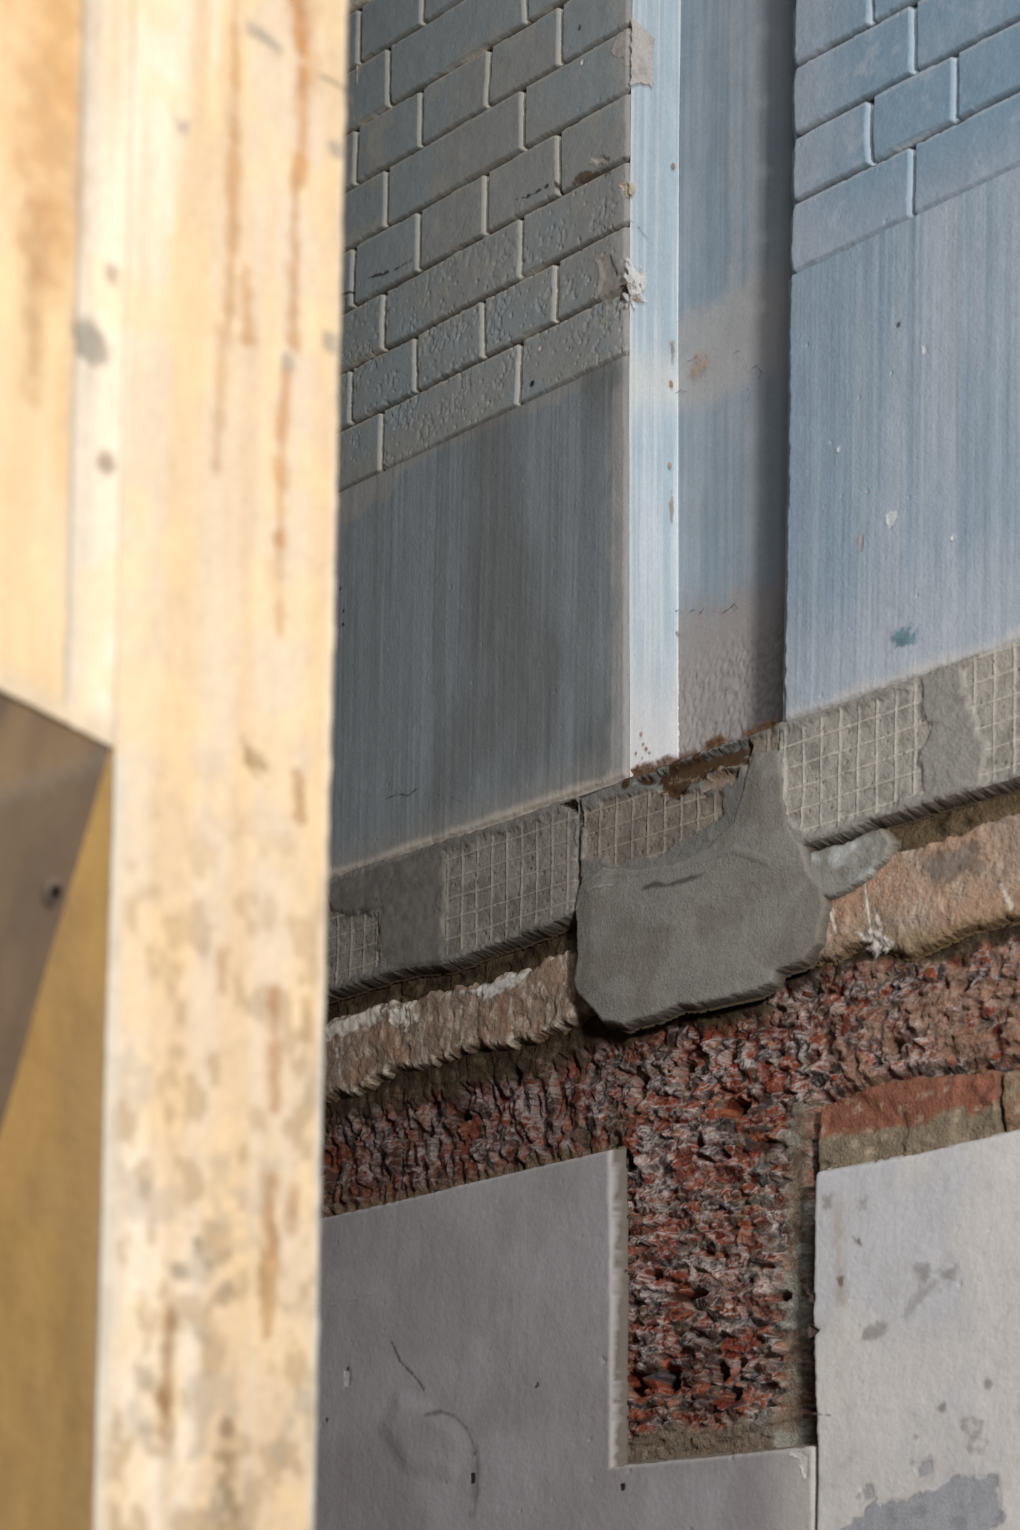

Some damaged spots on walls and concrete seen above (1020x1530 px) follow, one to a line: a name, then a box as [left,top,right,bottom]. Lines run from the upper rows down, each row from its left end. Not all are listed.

spalling [888,793,1020,852]
spalling [320,923,1020,1480]